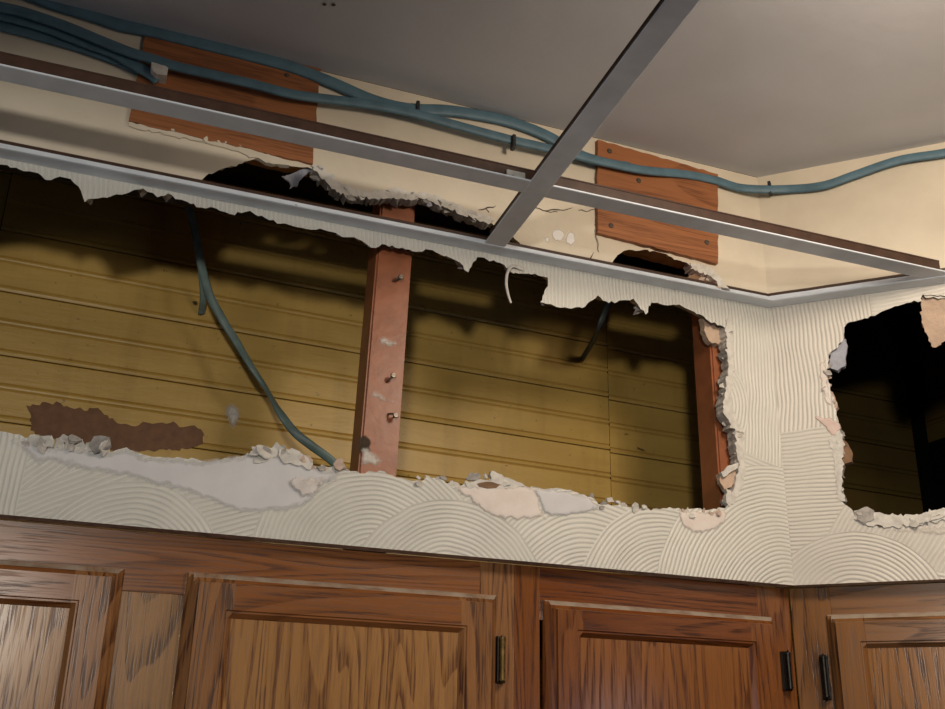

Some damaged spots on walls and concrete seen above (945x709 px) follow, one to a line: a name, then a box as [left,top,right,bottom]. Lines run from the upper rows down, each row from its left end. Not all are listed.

spalling [309,165,494,230]
spalling [683,263,730,291]
spalling [21,401,350,511]
spalling [415,471,647,520]
spalling [680,316,746,532]
spalling [816,339,945,534]